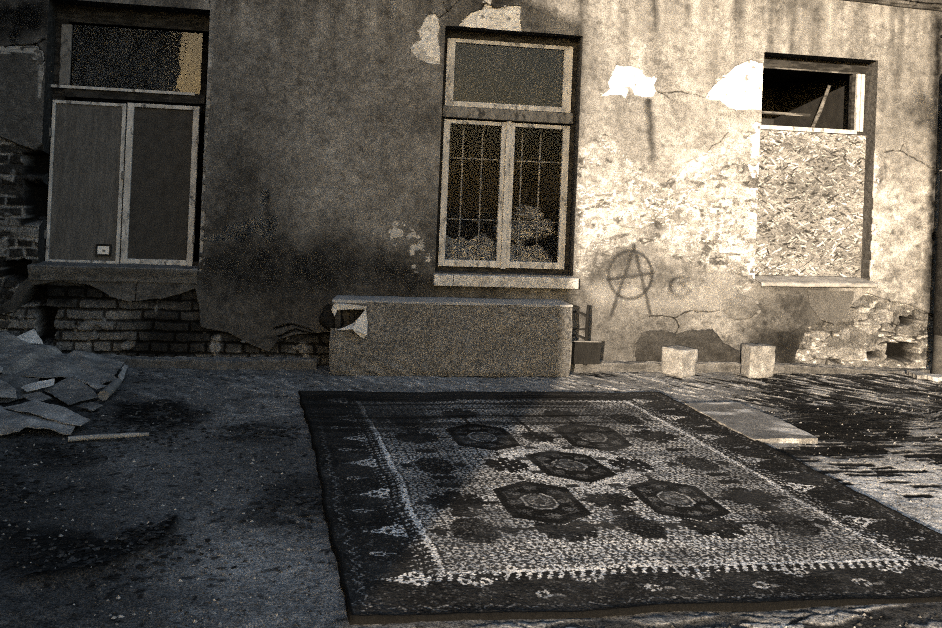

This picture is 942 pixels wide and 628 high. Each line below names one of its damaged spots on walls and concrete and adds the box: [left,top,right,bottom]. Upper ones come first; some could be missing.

crack [5,39,45,62]
flaking render [410,14,440,64]
flaking render [458,0,523,32]
flaking render [600,65,657,98]
flaking render [705,60,763,111]
peeling [575,122,760,295]
flaking render [0,137,330,366]
flaking render [795,294,934,369]